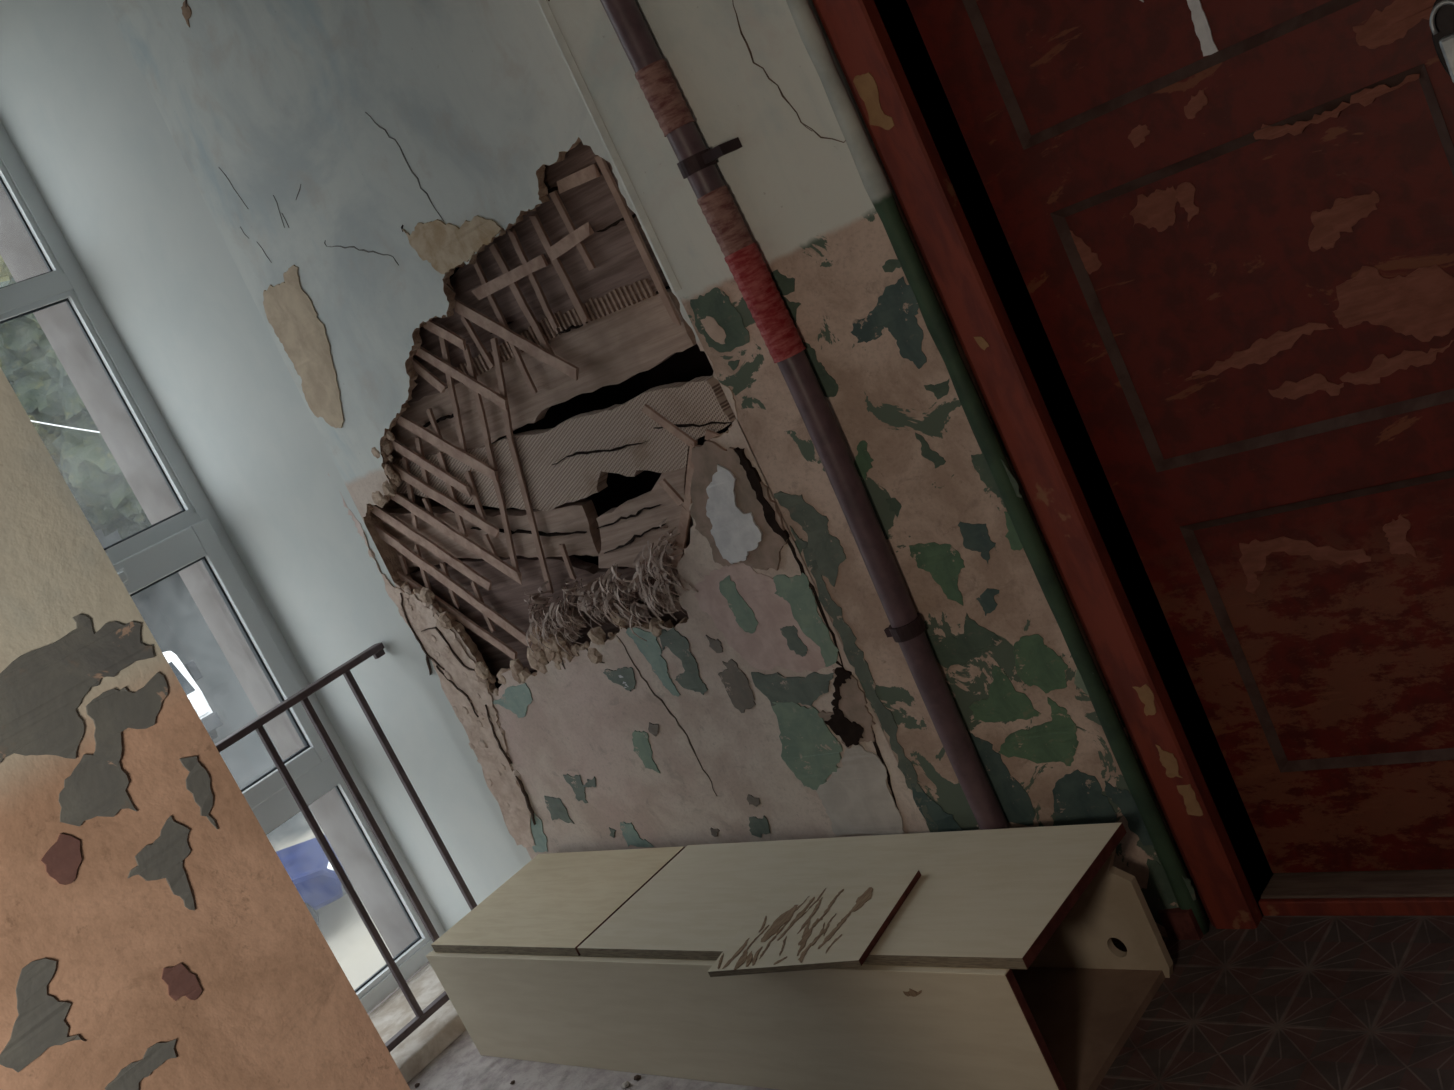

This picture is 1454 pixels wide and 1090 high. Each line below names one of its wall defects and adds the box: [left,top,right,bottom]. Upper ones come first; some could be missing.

crack [732,0,846,143]
crack [219,168,301,263]
crack [365,112,444,221]
spalling [263,265,344,428]
spalling [363,141,964,853]
crack [787,538,844,668]
peeling [0,614,168,885]
peeling [128,756,218,911]
crack [562,635,717,796]
crack [873,731,899,810]
peeling [0,958,84,1072]
peeling [104,1039,177,1090]